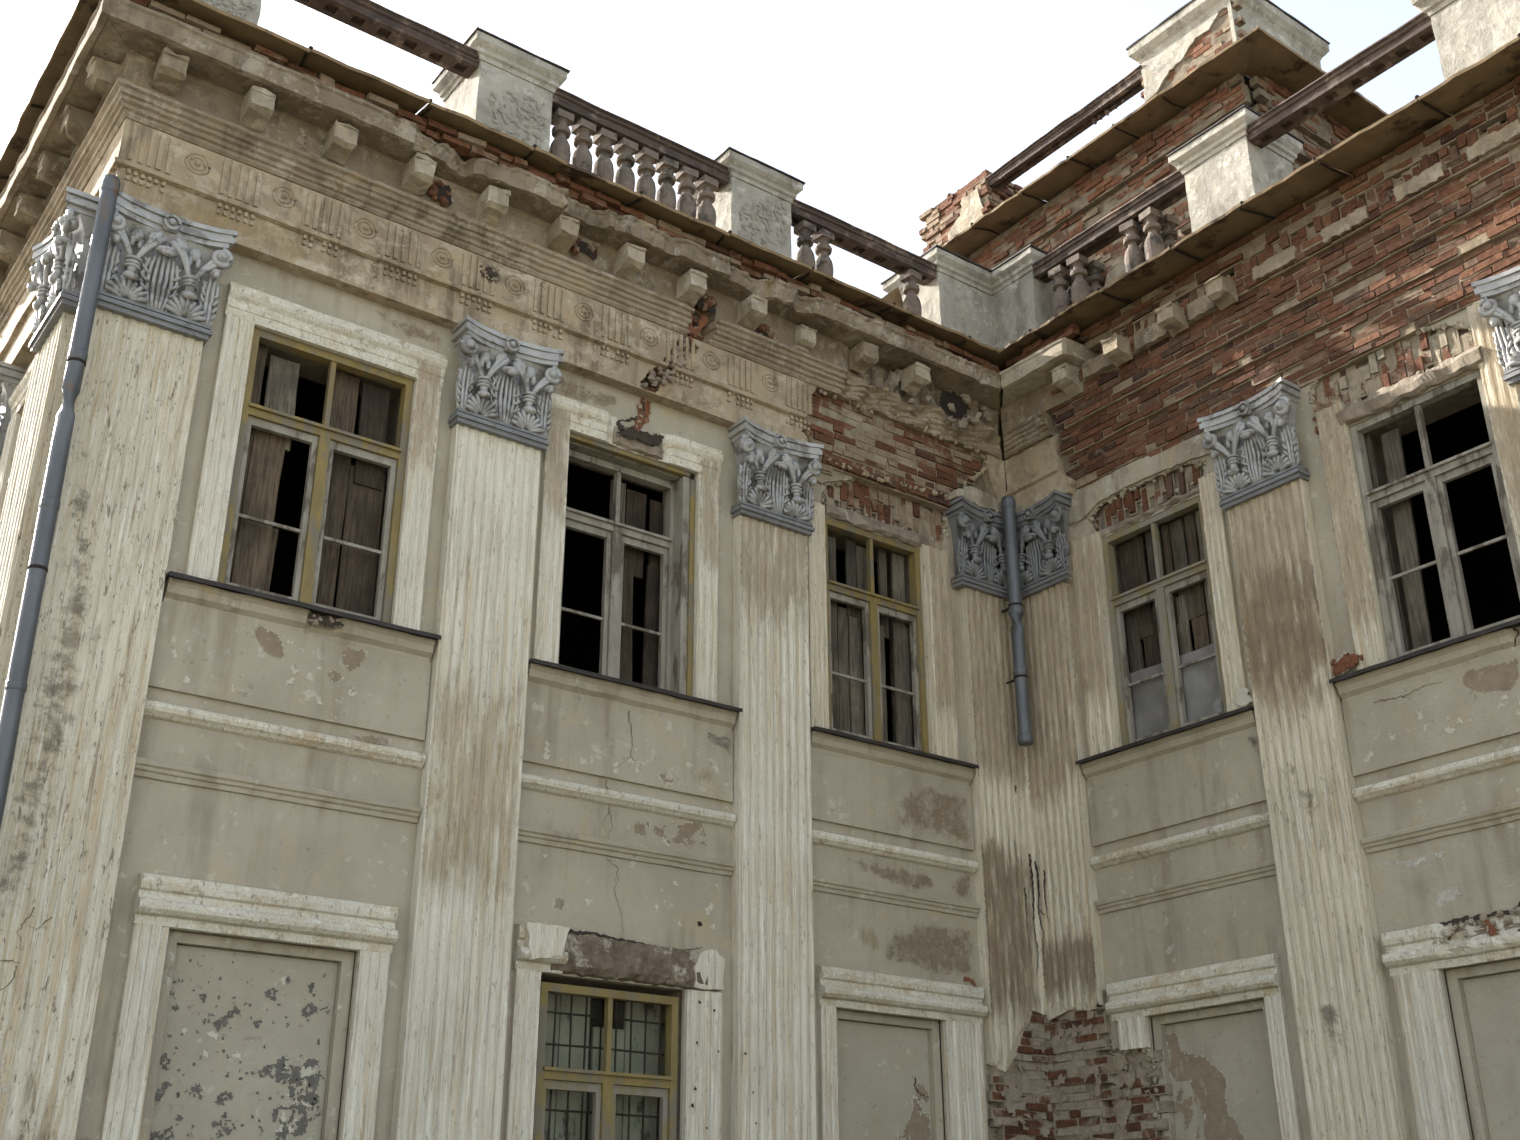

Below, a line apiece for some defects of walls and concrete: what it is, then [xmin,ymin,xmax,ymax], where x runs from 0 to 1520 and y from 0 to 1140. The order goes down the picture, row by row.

flaking render [802,369,1003,556]
peeling [254,626,368,696]
damp [1240,561,1325,695]
crack [602,711,641,929]
spalling [551,934,708,991]
damp [860,862,933,888]
damp [903,788,965,840]
damp [887,840,1095,1015]
crack [1024,854,1049,973]
flaking render [1454,920,1520,937]
peeling [150,973,329,1140]
flaking render [986,990,1246,1140]